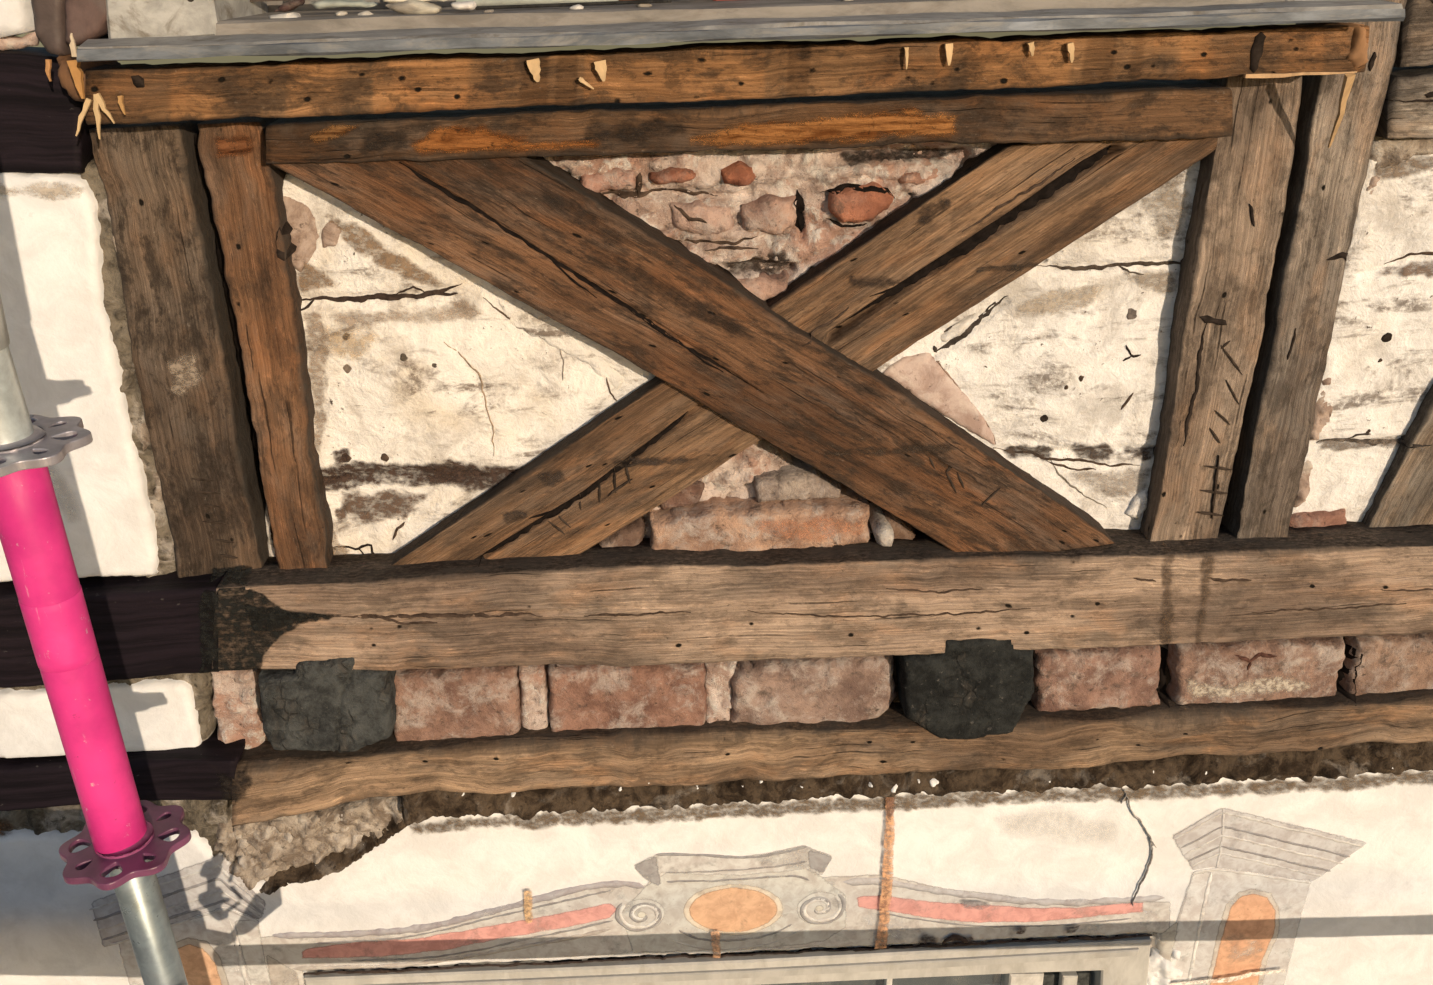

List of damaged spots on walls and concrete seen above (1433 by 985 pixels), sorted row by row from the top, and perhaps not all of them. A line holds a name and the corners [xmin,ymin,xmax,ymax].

crack [794,145,1111,347]
crack [1037,261,1181,275]
crack [1385,252,1433,264]
crack [301,284,510,319]
crack [932,296,1140,508]
crack [1210,577,1433,613]
crack [1236,652,1277,670]
crack [1336,644,1363,706]
flaking render [214,796,413,895]
rust [524,891,533,923]
crack [303,789,1156,975]
rust [874,797,895,949]